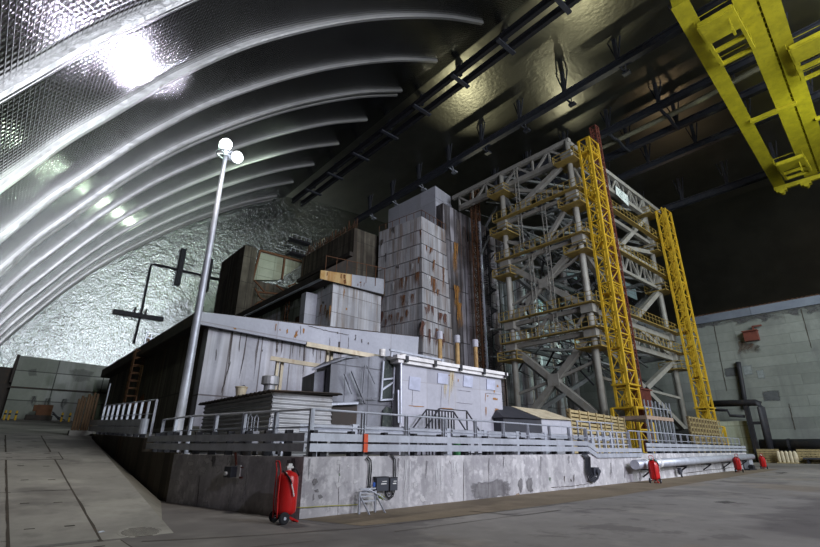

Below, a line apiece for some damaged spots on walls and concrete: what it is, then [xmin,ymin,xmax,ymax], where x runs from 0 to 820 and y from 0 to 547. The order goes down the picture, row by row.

rust [380,257,420,326]
rust [426,242,458,294]
rust [420,304,447,346]